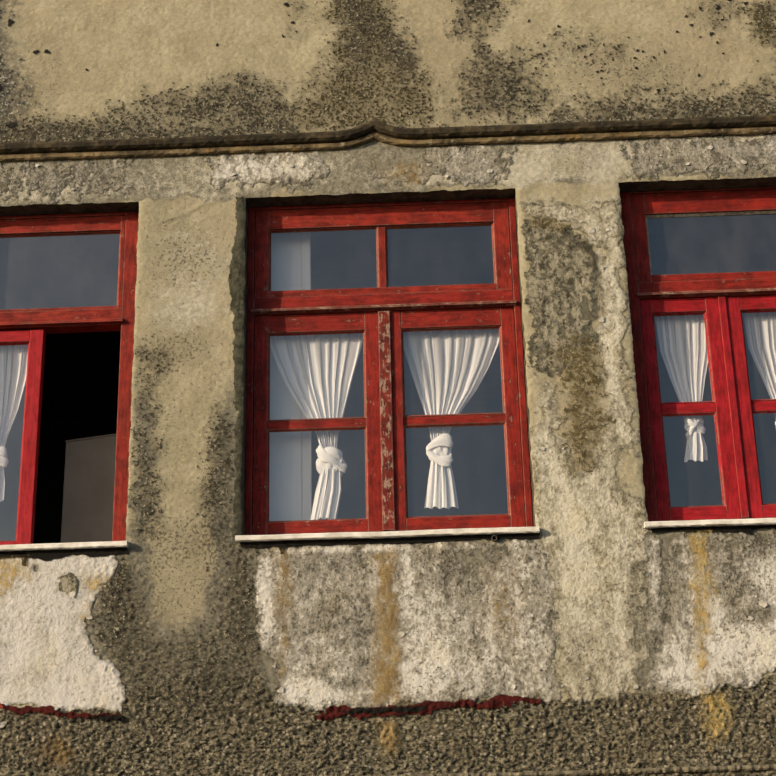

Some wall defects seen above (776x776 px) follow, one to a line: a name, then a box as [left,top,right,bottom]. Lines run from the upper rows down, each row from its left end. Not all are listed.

mould [0,0,776,162]
peeling [250,196,776,712]
peeling [0,554,125,712]
corrosion [373,552,401,701]
corrosion [690,532,711,670]
corrosion [381,722,398,749]
corrosion [704,694,732,736]